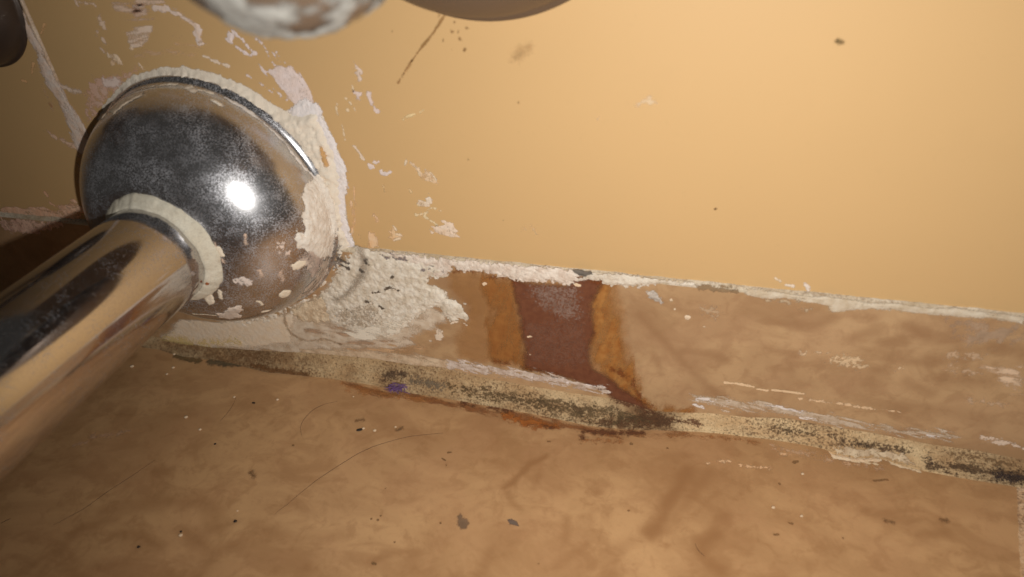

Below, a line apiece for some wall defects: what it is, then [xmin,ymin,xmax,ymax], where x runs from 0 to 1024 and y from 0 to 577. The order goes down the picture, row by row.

peeling [344,64,380,114]
peeling [367,160,392,176]
peeling [383,252,695,289]
leakage [163,336,308,376]
leakage [304,326,423,354]
rust [454,270,693,413]
leakage [379,370,701,431]
mould [770,424,1024,488]